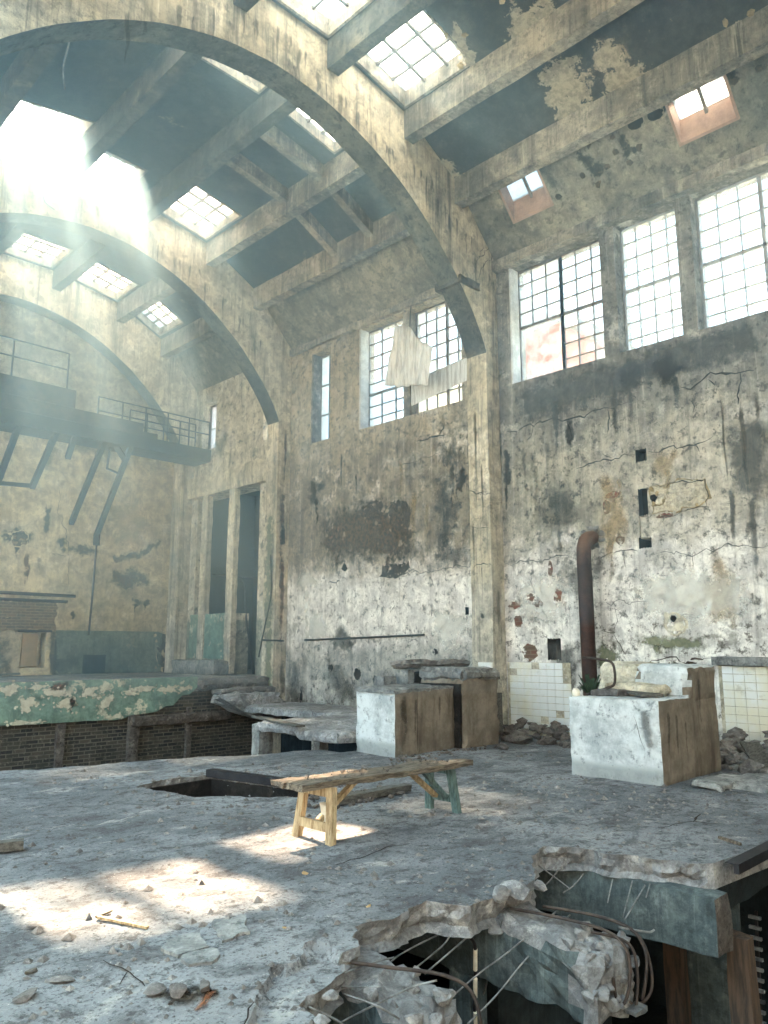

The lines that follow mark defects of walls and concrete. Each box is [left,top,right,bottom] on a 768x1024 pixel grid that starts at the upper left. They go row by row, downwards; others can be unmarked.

peeling [499,0,556,44]
peeling [537,36,648,121]
damp [523,323,757,451]
crack [682,370,753,411]
crack [507,402,712,469]
damp [308,480,417,574]
spalling [638,487,676,519]
crack [601,543,768,564]
spalling [521,638,561,662]
peeling [0,680,193,727]
spalling [500,880,655,1006]
spalling [308,934,529,1024]